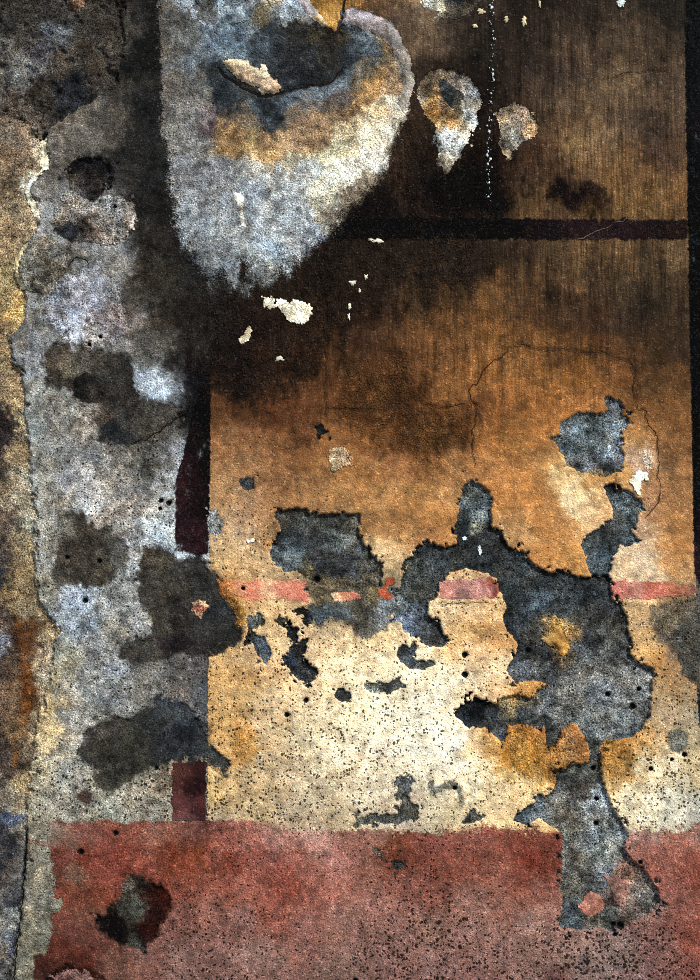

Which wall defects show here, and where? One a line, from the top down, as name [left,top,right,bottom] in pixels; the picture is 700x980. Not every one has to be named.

spalling [156,0,486,324]
damp [486,0,496,201]
spalling [494,101,539,161]
spalling [0,0,129,980]
efflorescence [40,259,130,351]
spalling [40,335,185,446]
peeling [239,326,252,344]
damp [328,447,353,472]
crack [412,344,661,516]
spalling [52,396,667,937]
spalling [94,874,172,956]